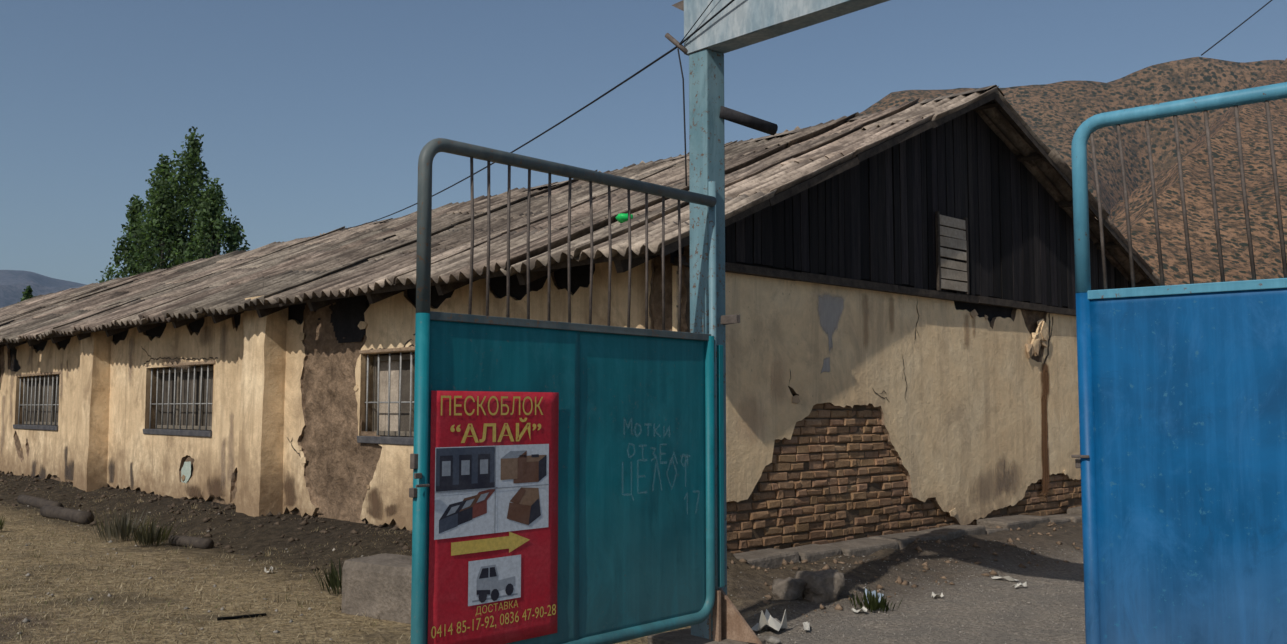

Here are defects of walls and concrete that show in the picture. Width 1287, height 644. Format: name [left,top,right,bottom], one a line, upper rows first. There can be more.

spalling [403,285,455,309]
spalling [112,324,166,345]
spalling [186,318,205,336]
spalling [231,314,241,332]
peeling [818,295,843,373]
flaking render [954,301,1048,362]
spalling [288,295,382,524]
flaking render [179,455,195,484]
spalling [727,371,1082,554]